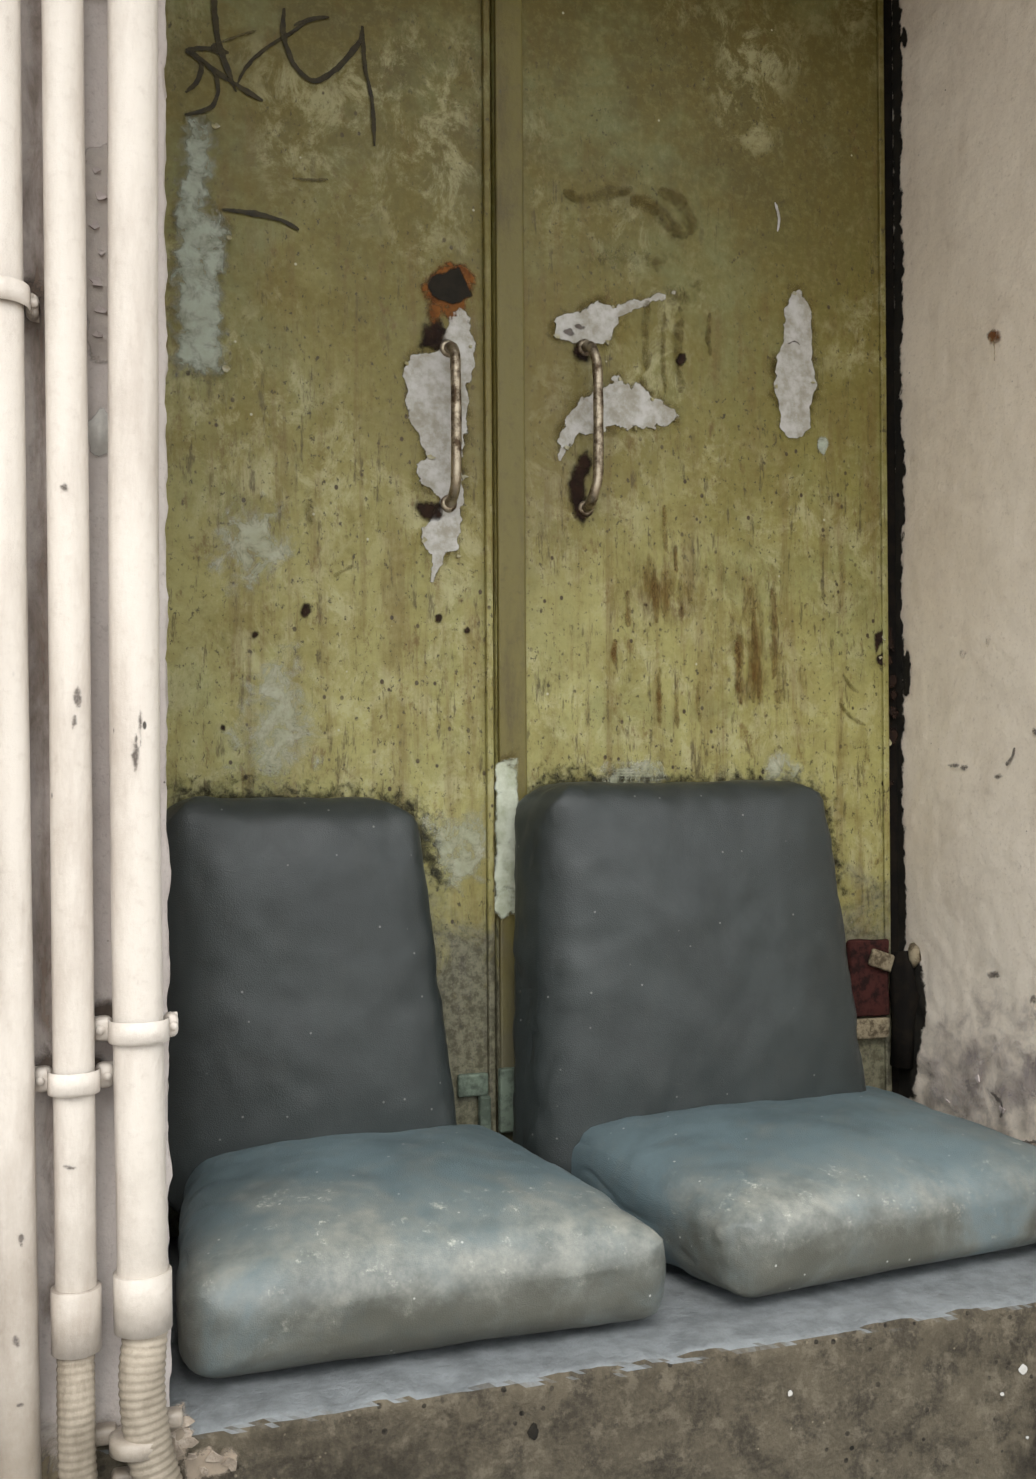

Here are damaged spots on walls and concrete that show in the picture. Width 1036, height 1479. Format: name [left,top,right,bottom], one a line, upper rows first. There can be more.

peeling [171,116,232,376]
peeling [402,308,476,582]
rust [419,261,475,350]
peeling [551,290,676,345]
peeling [557,375,678,461]
peeling [771,290,828,455]
damp [891,0,911,951]
rust [735,589,776,704]
damp [898,962,1036,1118]
damp [41,1451,59,1479]